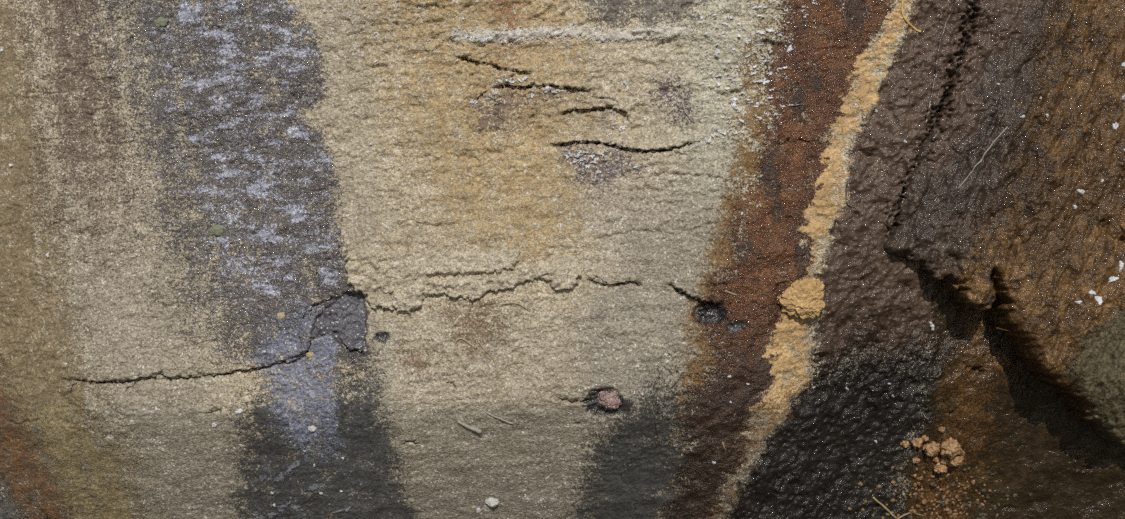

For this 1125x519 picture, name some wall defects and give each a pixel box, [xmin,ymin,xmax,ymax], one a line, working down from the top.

crack [455,55,629,121]
crack [545,140,695,154]
crack [67,296,363,394]
water stain [0,0,818,519]
peeling [309,246,585,353]